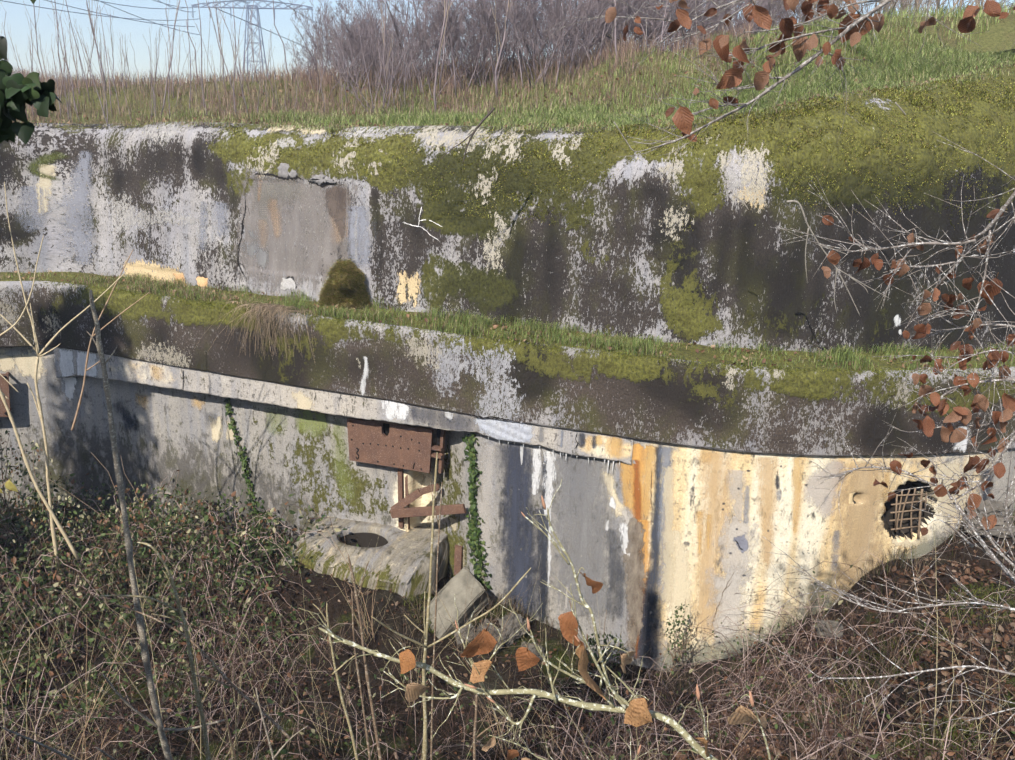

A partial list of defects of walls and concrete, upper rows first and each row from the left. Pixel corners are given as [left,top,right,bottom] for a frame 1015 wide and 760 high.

leakage [21,153,65,229]
leakage [65,152,91,263]
spalling [232,125,525,293]
peeling [548,132,581,170]
rust [596,436,656,613]
spalling [892,535,920,547]